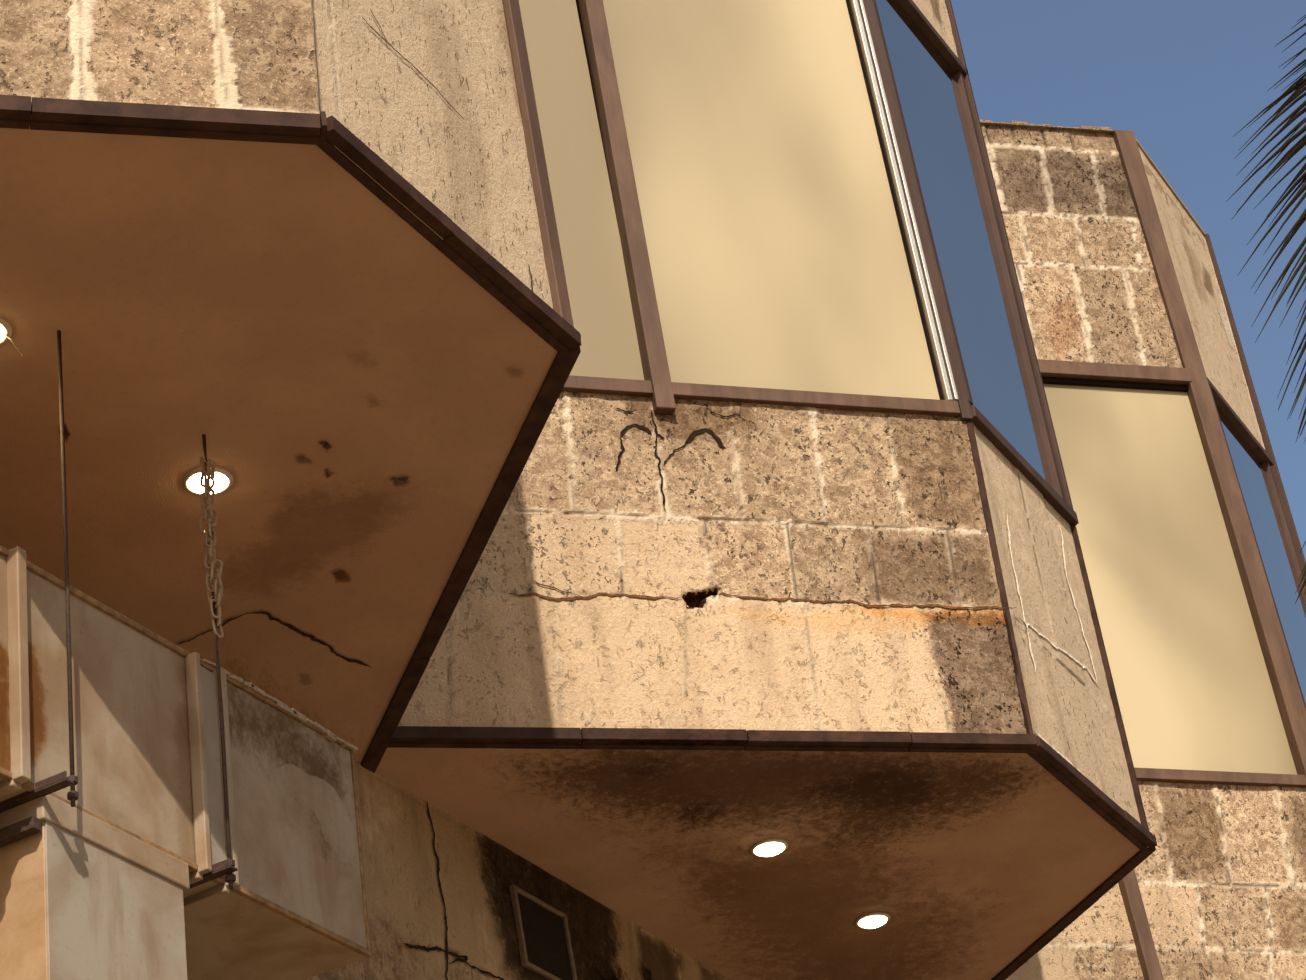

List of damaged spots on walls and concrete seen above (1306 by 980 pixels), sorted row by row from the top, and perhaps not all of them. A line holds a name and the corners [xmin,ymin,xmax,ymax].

crack [616,408,736,511]
crack [175,611,372,668]
crack [507,515,1103,691]
crack [1033,728,1083,774]
crack [403,802,504,980]